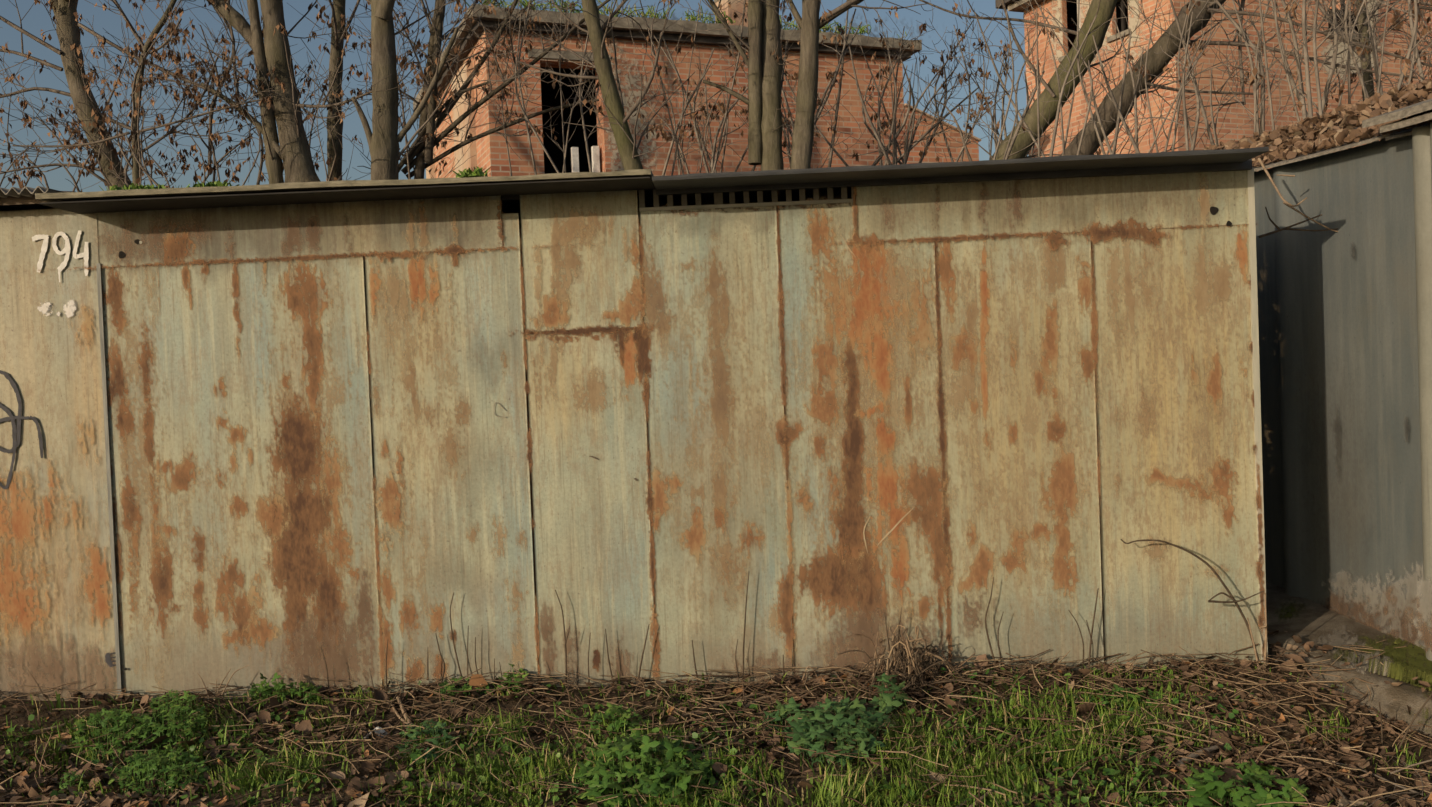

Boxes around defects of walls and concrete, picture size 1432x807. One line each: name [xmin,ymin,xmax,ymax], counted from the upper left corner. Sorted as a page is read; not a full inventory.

corrosion [0,200,516,694]
corrosion [506,178,1265,687]